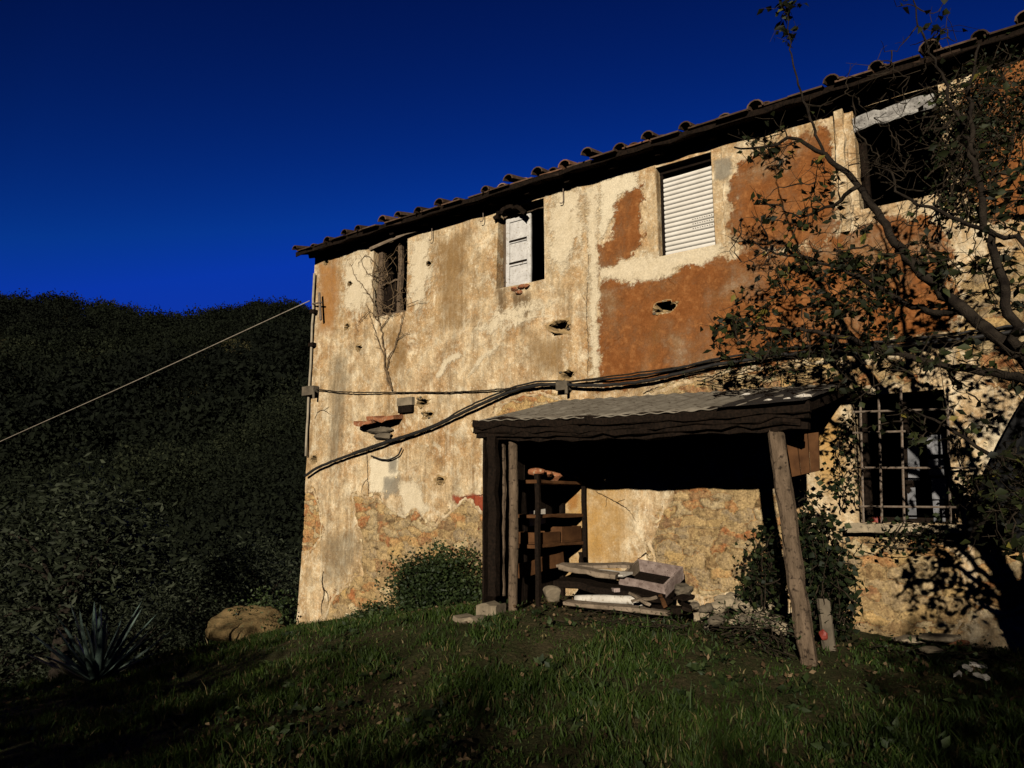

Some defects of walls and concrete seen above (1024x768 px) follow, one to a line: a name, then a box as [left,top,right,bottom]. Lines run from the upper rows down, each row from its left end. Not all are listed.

spalling [545,317,571,334]
peeling [558,122,1024,403]
spalling [302,485,325,553]
spalling [325,490,482,621]
spalling [645,474,787,601]